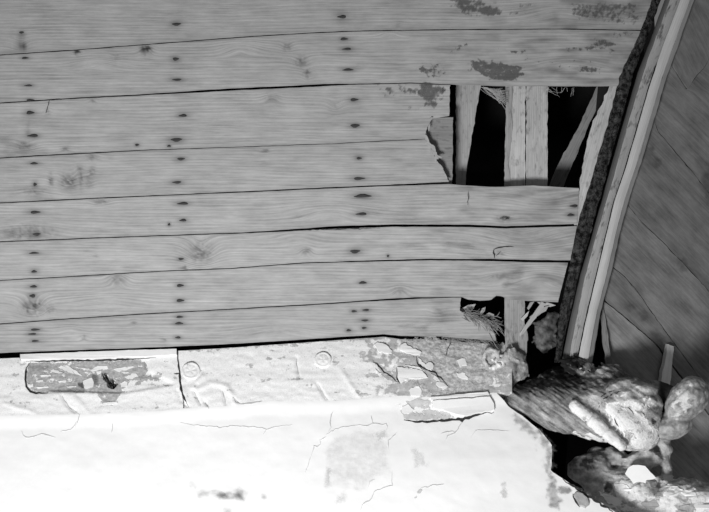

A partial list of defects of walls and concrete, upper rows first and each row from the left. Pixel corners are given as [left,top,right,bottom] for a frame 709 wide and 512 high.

peeling [366,336,506,421]
crack [305,412,502,472]